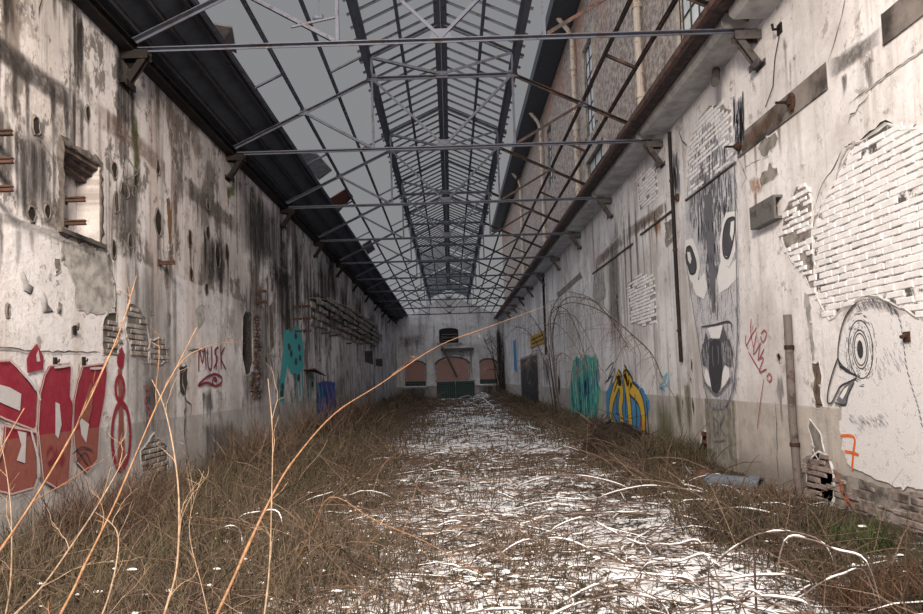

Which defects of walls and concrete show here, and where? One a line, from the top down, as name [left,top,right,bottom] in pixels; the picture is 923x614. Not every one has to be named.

water stain [53,0,83,78]
water stain [0,110,56,207]
water stain [0,40,83,144]
flaking render [686,100,734,195]
crack [813,49,923,226]
peeling [26,134,169,366]
peeling [153,197,173,288]
water stain [190,174,380,385]
flaking render [592,264,657,326]
flaking render [778,121,923,410]
peeling [178,363,189,397]
flaking render [801,418,923,534]